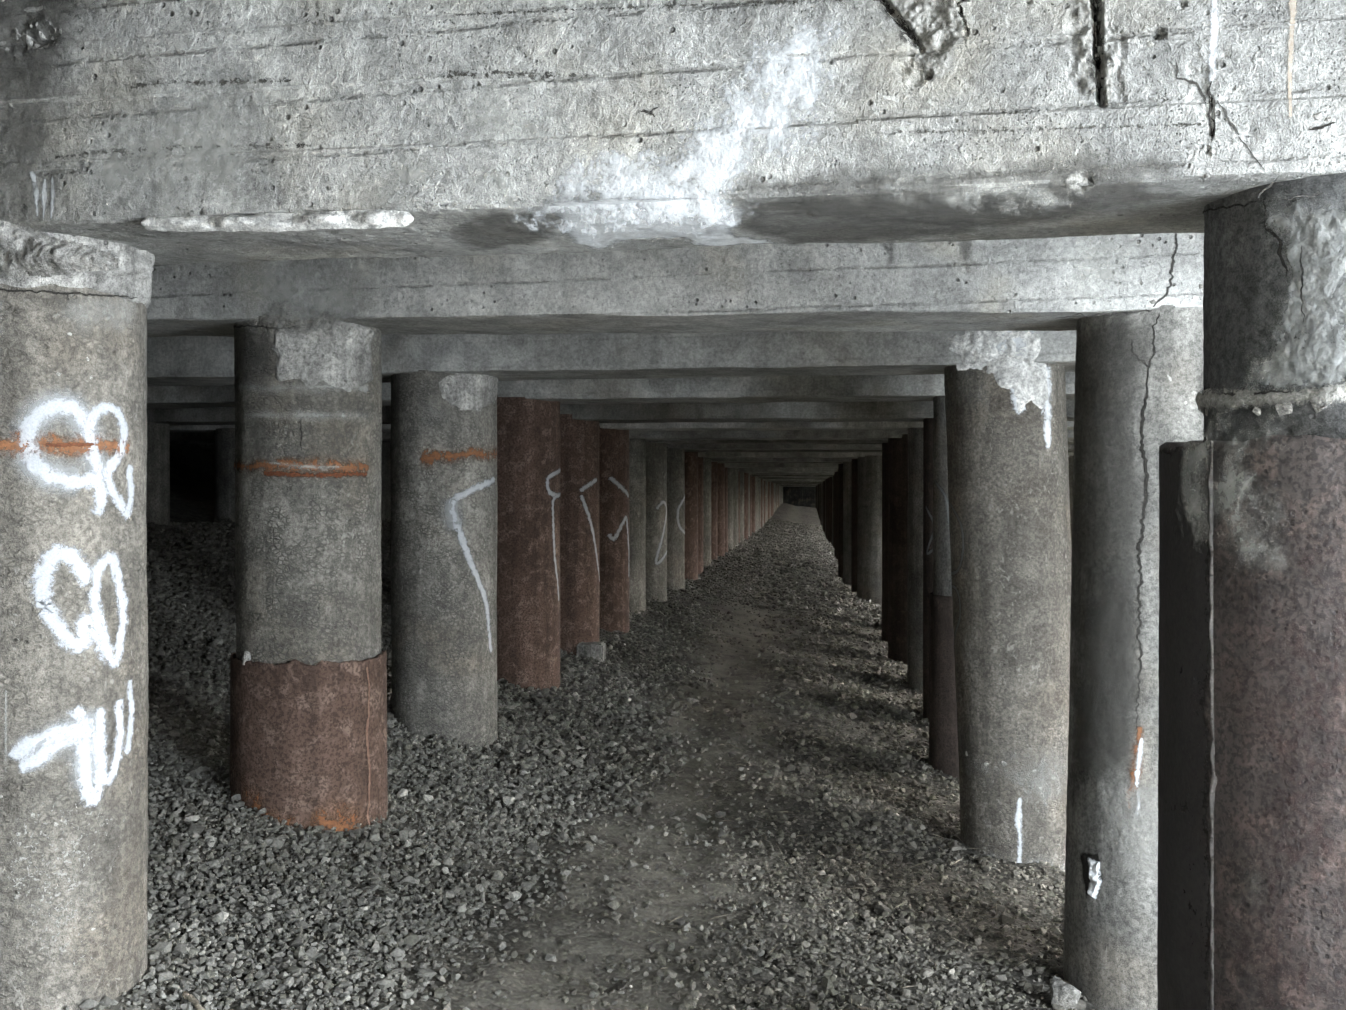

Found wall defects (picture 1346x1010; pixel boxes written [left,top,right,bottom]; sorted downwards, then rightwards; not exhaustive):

water stain [454,23,1161,261]
crack [880,0,968,82]
crack [1068,0,1113,106]
crack [1176,0,1326,200]
crack [1309,112,1336,130]
crack [1059,233,1203,318]